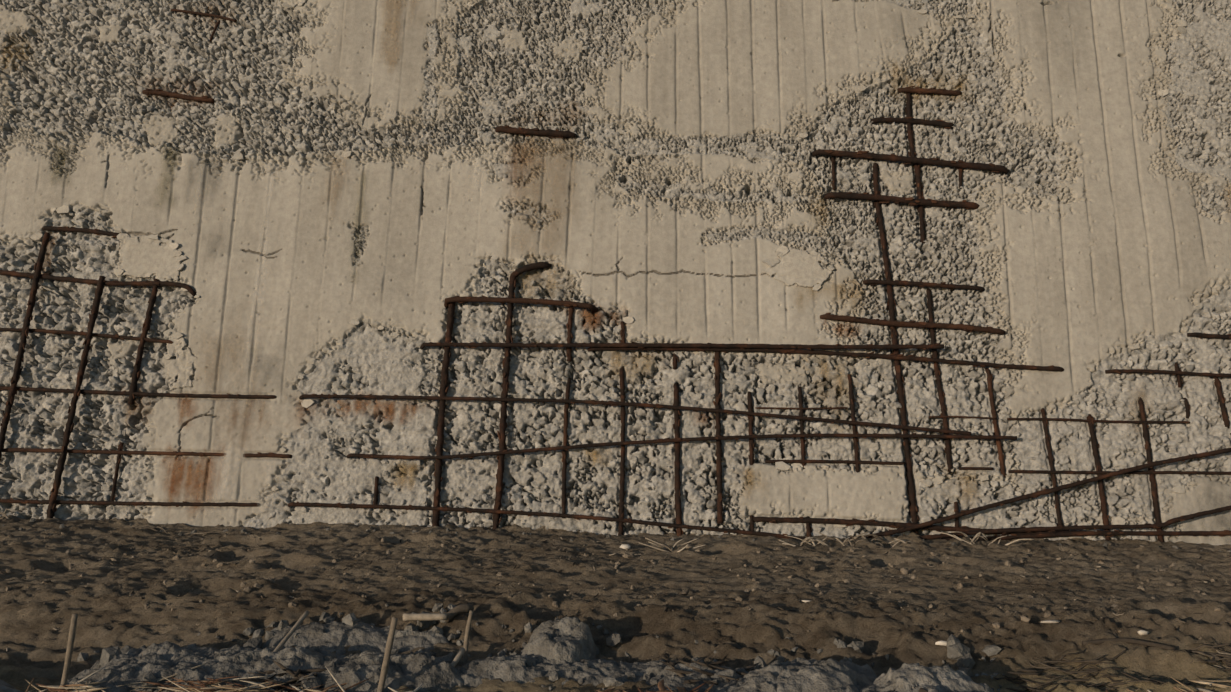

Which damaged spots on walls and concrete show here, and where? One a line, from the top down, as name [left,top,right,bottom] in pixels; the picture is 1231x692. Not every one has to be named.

spalling [0,0,289,128]
peeling [205,144,244,161]
spalling [414,2,577,148]
spalling [1157,0,1231,216]
spalling [353,226,366,266]
crack [580,257,775,278]
peeling [762,229,907,291]
spalling [0,205,200,521]